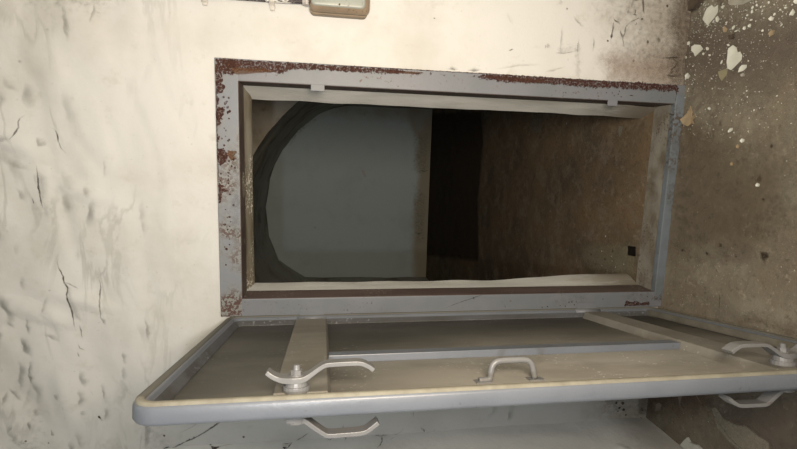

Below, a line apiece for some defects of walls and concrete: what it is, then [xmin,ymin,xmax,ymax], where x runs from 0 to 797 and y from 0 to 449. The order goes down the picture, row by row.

peeling [703,5,719,26]
rust [443,71,679,92]
peeling [680,106,696,126]
rust [215,58,433,250]